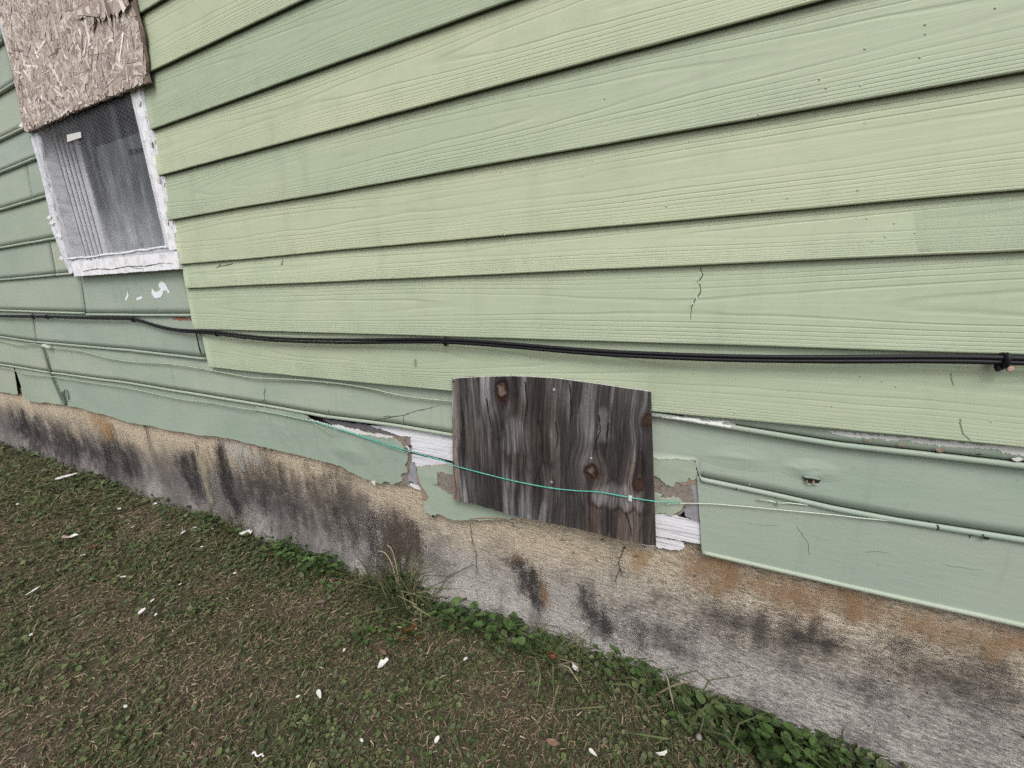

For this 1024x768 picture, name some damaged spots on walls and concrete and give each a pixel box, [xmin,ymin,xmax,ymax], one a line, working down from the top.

water stain [11,412,140,476]
water stain [176,445,251,516]
peeling [653,458,700,522]
water stain [511,557,546,613]
water stain [583,593,613,640]